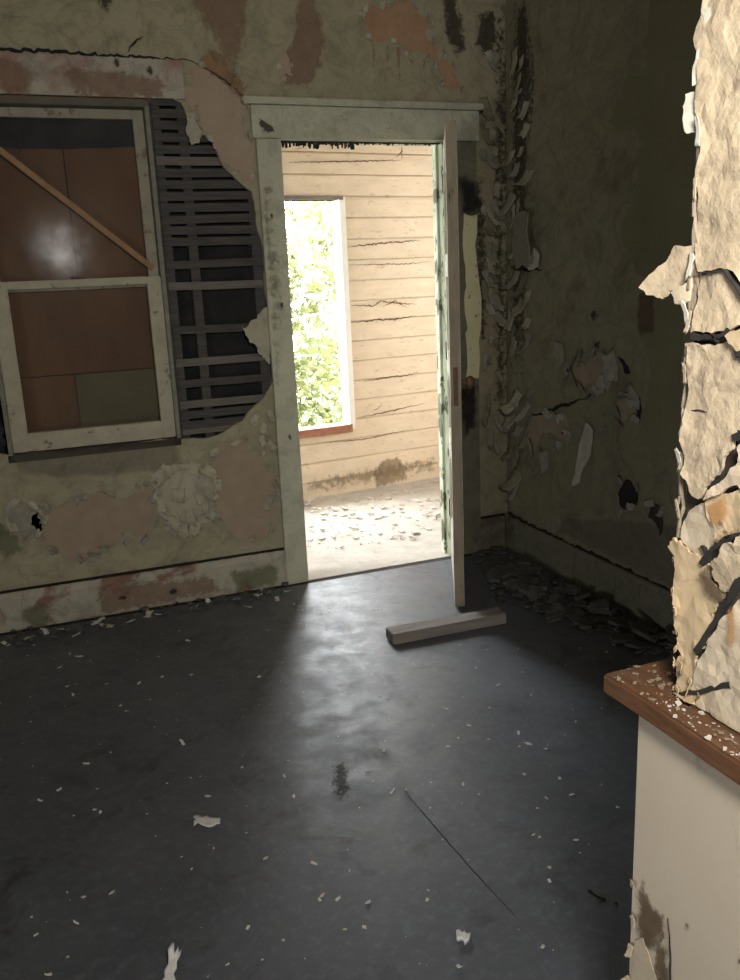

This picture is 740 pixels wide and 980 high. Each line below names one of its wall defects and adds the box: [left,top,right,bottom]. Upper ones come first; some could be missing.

crack [0,36,242,96]
spalling [145,61,278,451]
crack [699,269,740,295]
crack [690,328,740,358]
crack [731,430,740,441]
water stain [312,458,432,489]
crack [704,464,736,496]
crack [693,532,740,655]
crack [675,682,731,696]
peeling [620,914,657,980]